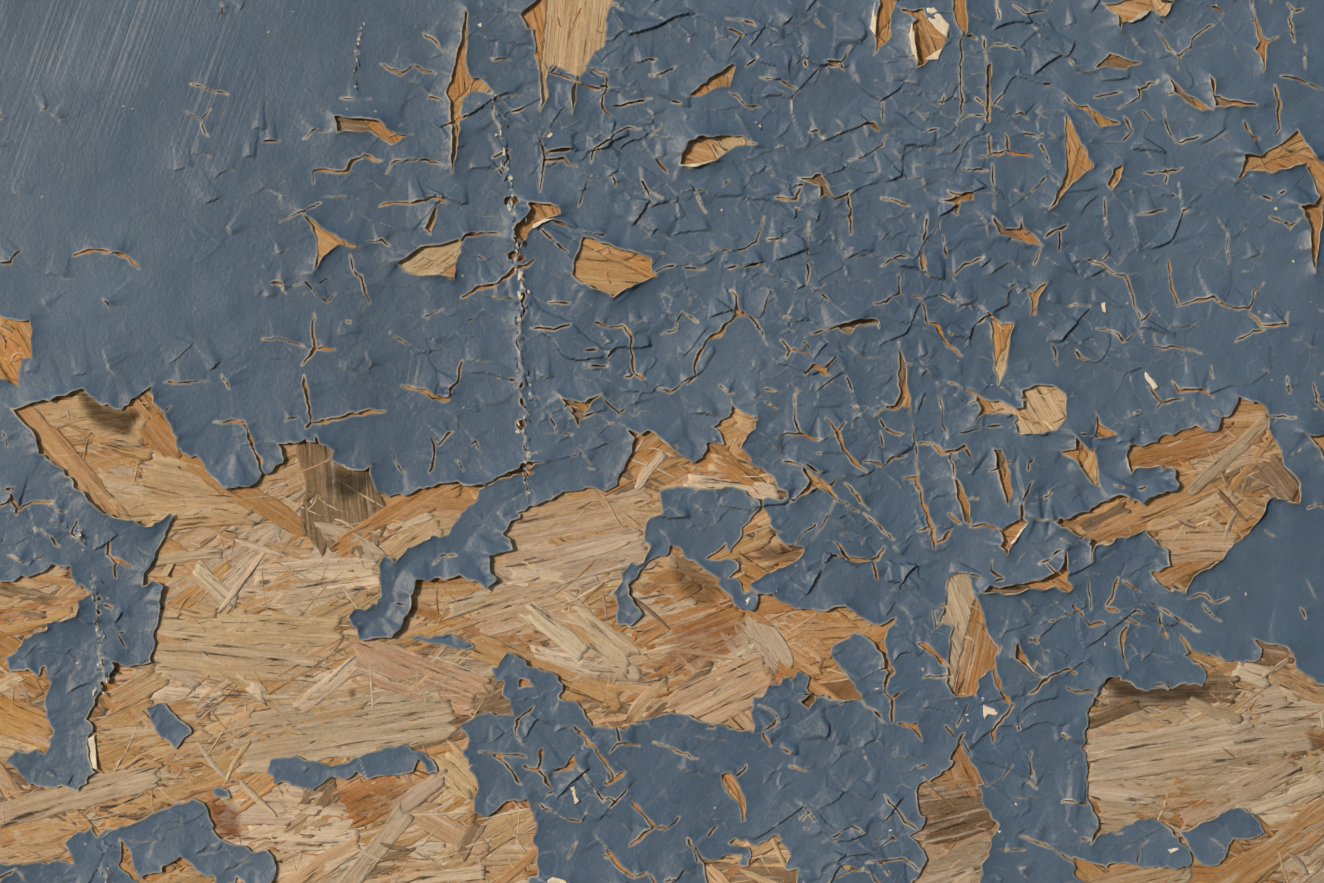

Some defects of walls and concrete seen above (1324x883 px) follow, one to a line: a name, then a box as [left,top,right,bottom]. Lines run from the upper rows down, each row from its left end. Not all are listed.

peeling [511,0,623,123]
crack [954,0,1039,164]
crack [208,414,269,477]
peeling [0,307,907,883]
crack [297,64,648,500]
peeling [503,194,666,308]
crack [605,284,752,399]
crack [771,251,1040,586]
peeling [931,273,1324,718]
crack [1041,219,1294,419]
peeling [1227,121,1324,283]
peeling [834,620,1324,883]